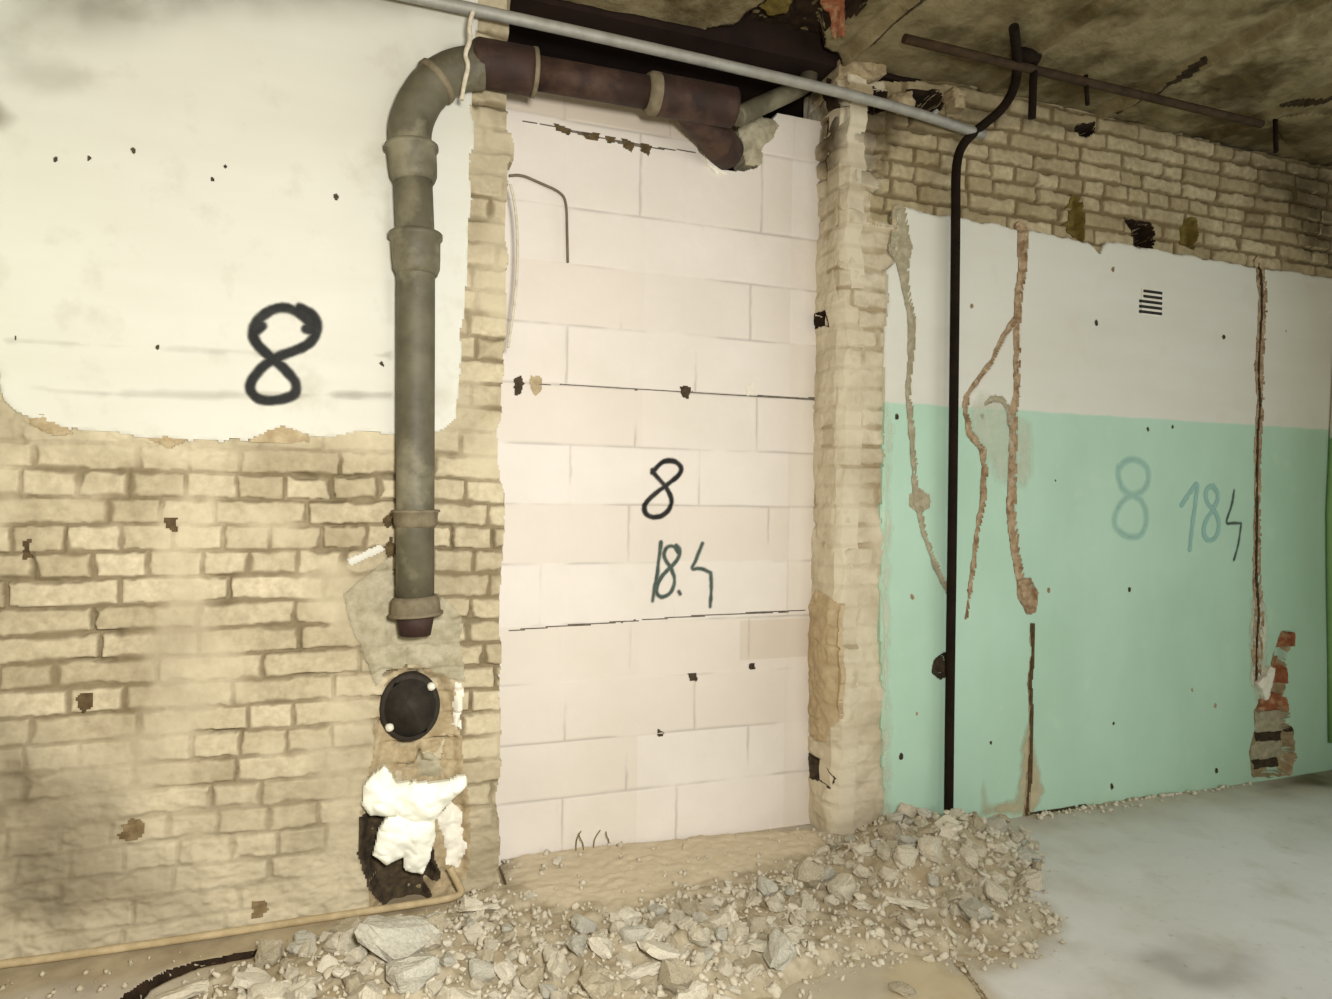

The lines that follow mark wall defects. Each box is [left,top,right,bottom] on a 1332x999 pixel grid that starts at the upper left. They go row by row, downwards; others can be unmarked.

flaking render [475,0,510,41]
flaking render [0,89,542,960]
spalling [1249,597,1298,778]